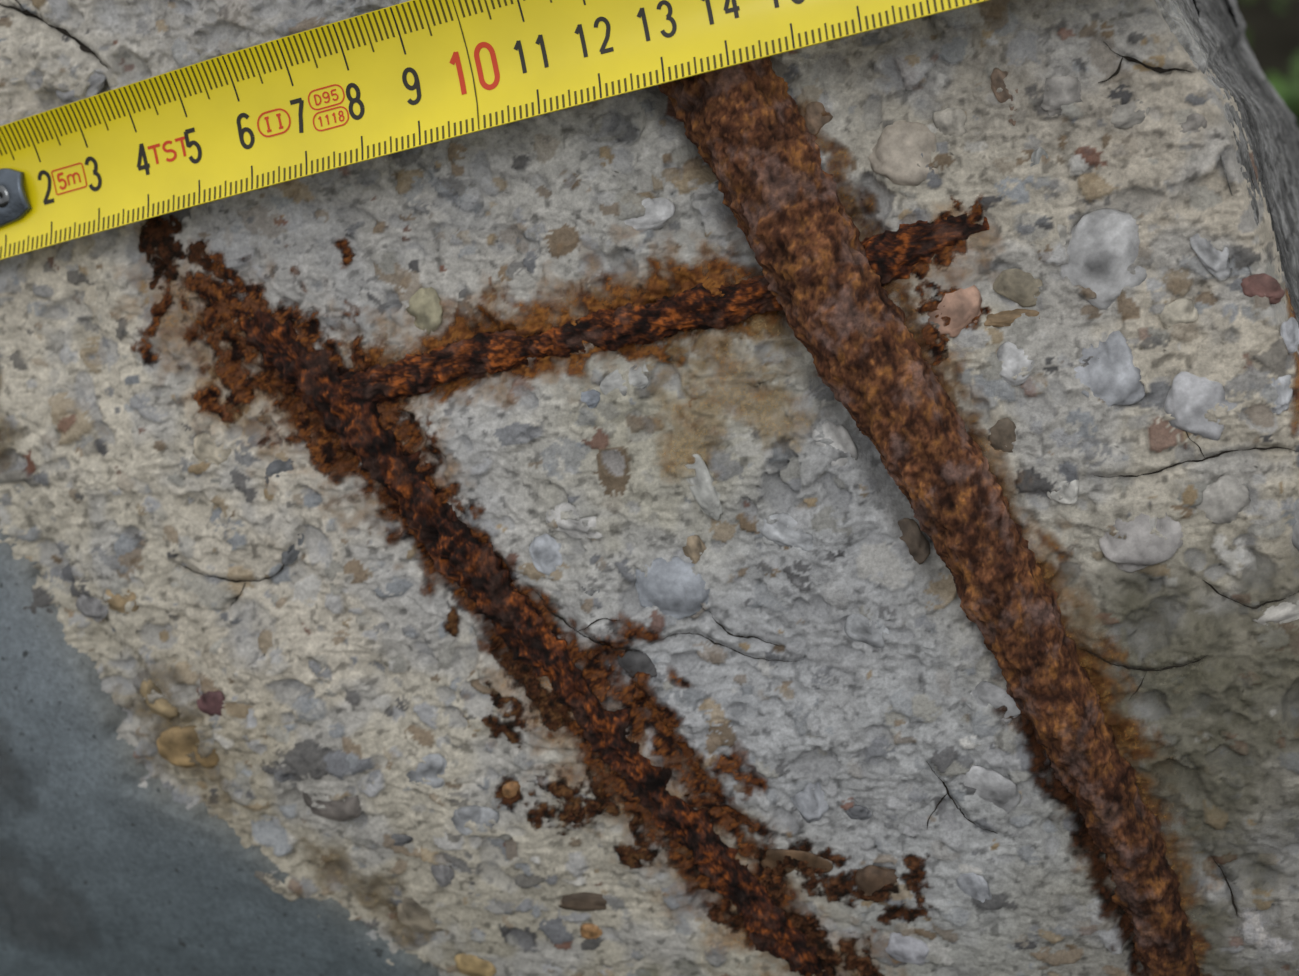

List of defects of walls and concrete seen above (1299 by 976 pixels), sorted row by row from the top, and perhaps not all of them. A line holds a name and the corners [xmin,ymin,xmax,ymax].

spalling [0,0,410,126]
crack [1098,41,1191,83]
corrosion [814,133,881,240]
corrosion [882,197,983,394]
corrosion [966,306,991,329]
spalling [0,85,801,976]
corrosion [959,413,1026,535]
spalling [769,0,1299,976]
spalling [398,310,1143,976]
corrosion [995,705,1141,976]
corrosion [1035,535,1210,976]